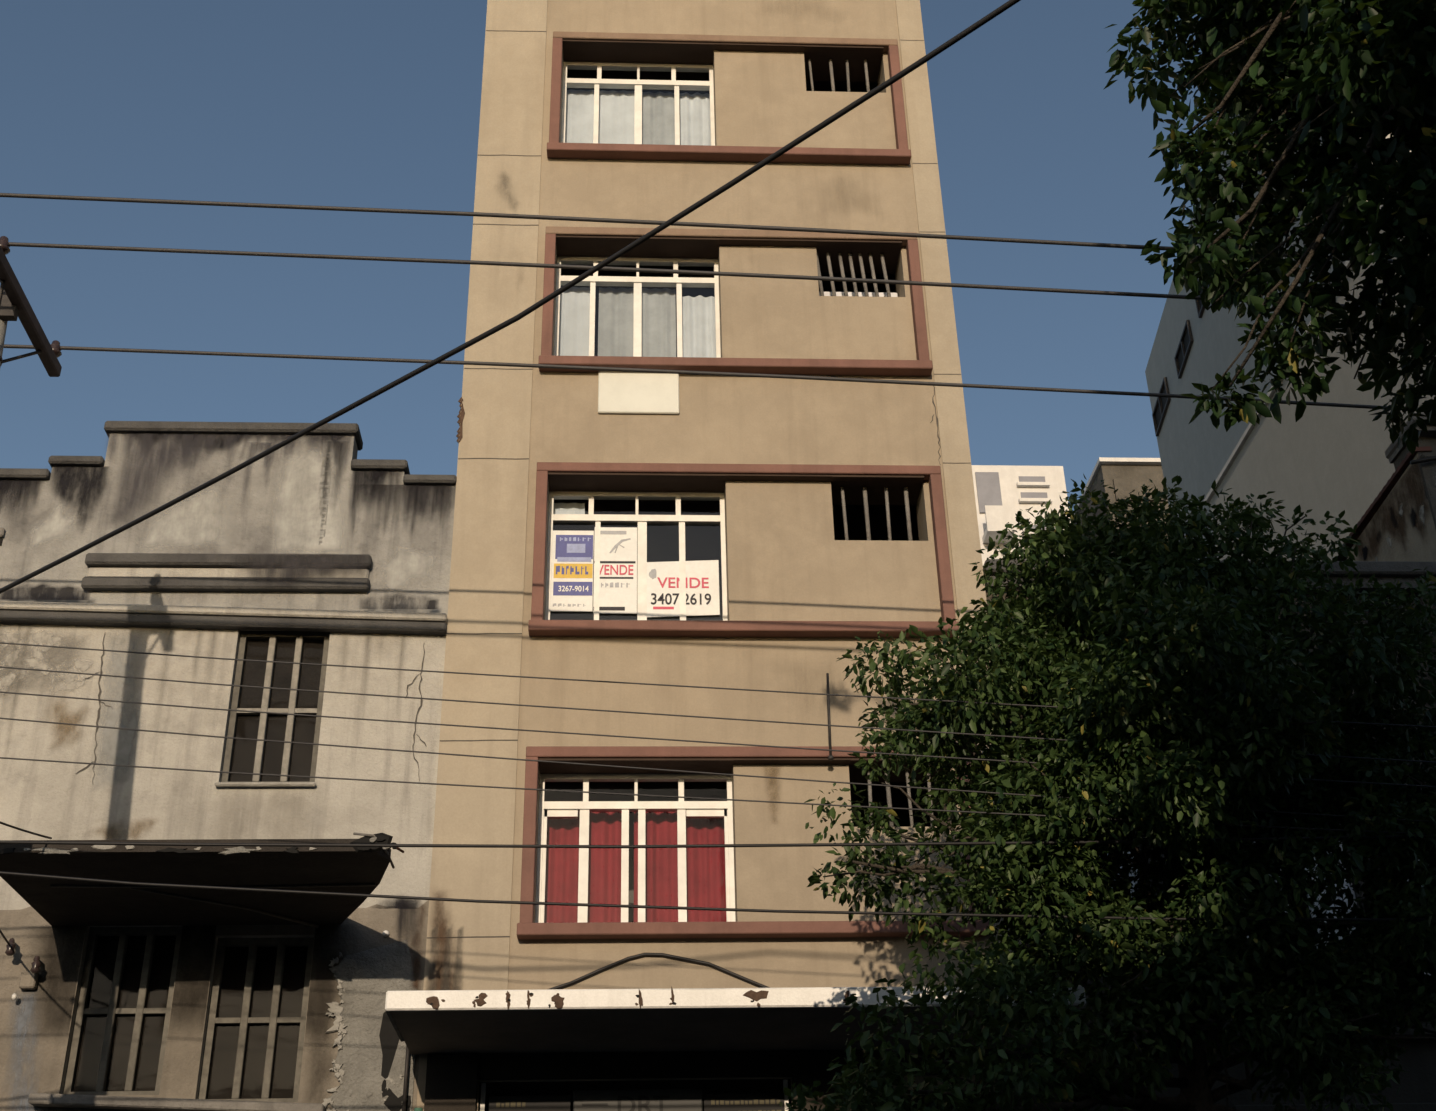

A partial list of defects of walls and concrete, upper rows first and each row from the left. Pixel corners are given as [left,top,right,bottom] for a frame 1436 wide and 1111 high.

damp [0,466,106,543]
damp [147,495,214,544]
damp [112,433,295,512]
damp [248,435,451,583]
damp [0,583,89,600]
damp [362,551,438,609]
crack [71,634,113,783]
crack [405,645,426,781]
spalling [322,939,445,1111]